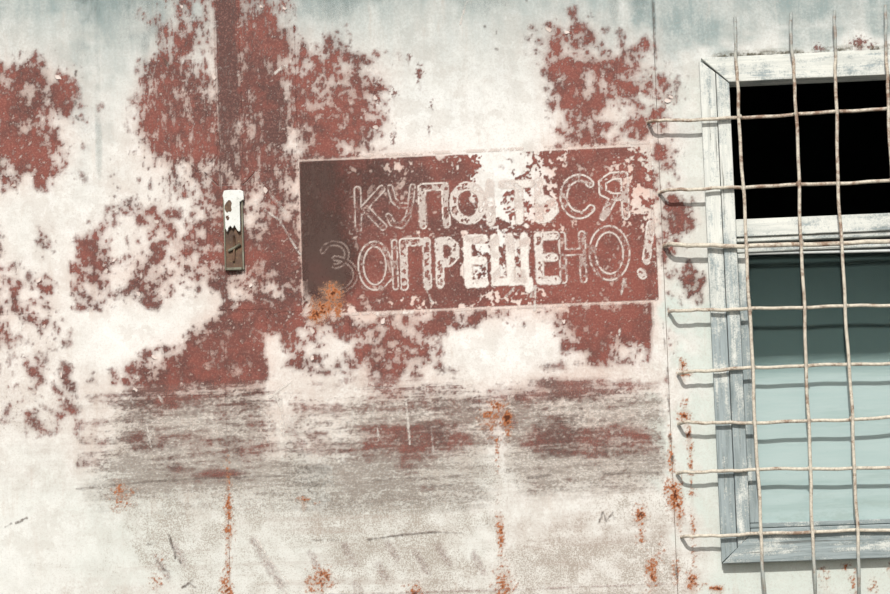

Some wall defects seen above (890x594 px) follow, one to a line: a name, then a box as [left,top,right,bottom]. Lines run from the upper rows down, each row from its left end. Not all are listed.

peeling [0,52,88,193]
peeling [528,6,706,304]
peeling [70,0,665,508]
peeling [0,263,70,347]
peeling [24,351,82,435]
rust [483,400,514,461]
rust [664,399,696,539]
rust [305,565,332,592]
rust [495,516,515,594]
rust [636,504,646,543]
rust [645,544,665,586]
rust [672,551,723,591]